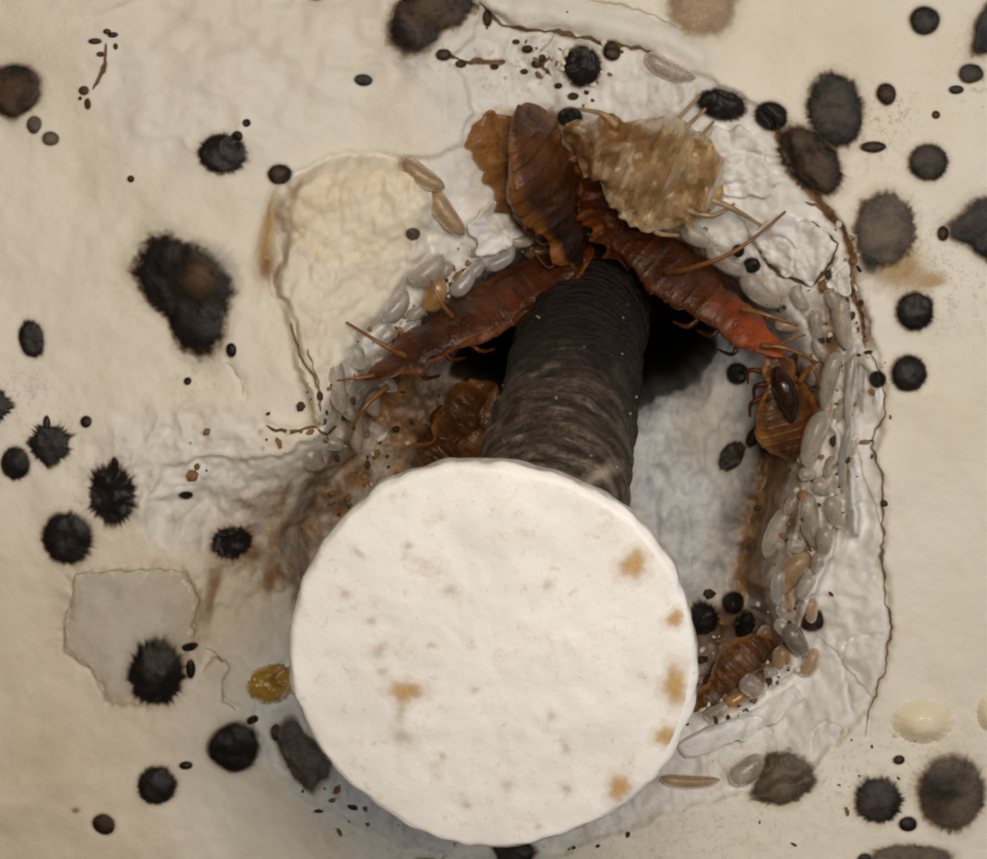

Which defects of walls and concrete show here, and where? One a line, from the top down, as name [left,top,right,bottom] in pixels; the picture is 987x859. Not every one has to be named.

peeling [70,0,447,183]
damp [436,49,467,68]
damp [512,39,546,74]
flaking render [145,9,892,859]
peeling [69,571,192,700]